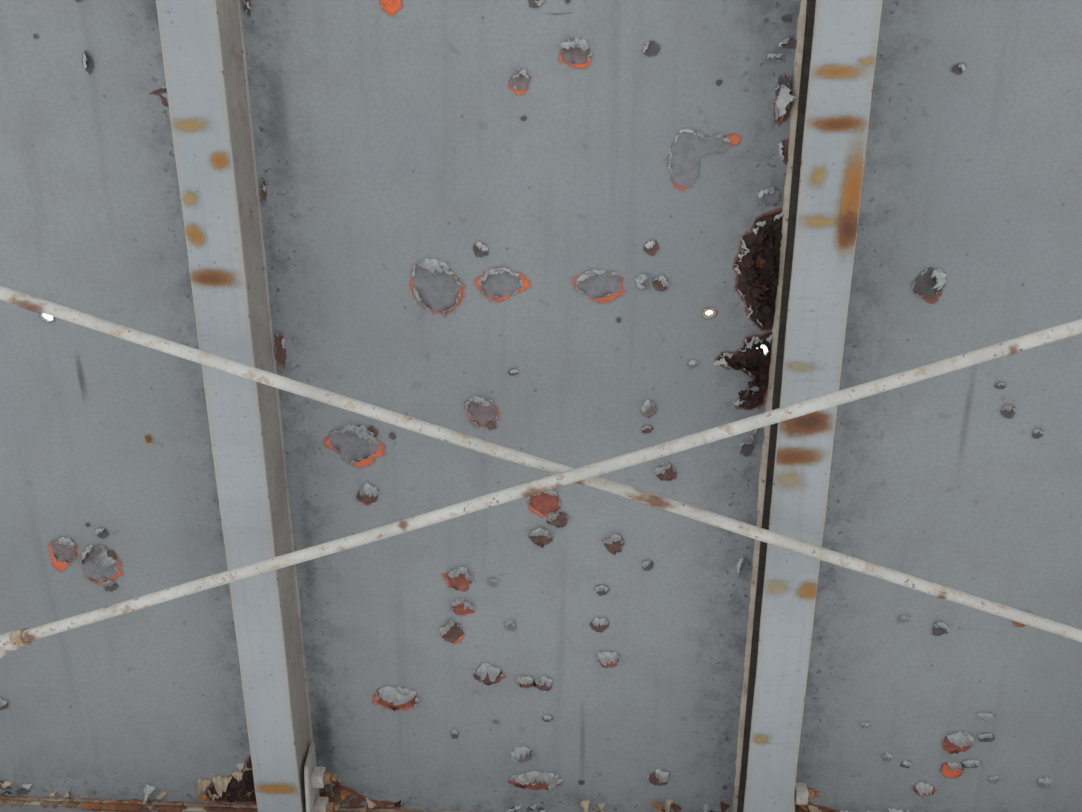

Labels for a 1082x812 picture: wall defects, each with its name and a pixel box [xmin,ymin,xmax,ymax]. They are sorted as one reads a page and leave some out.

peeling [379,0,403,16]
corrosion [813,117,863,131]
corrosion [805,156,863,247]
corrosion [191,270,233,286]
peeling [410,258,530,314]
corrosion [713,208,784,410]
peeling [324,424,396,467]
peeling [48,523,123,592]
peeling [373,685,419,711]
peeling [940,712,996,778]
corrosion [0,781,187,812]
corrosion [196,756,295,812]